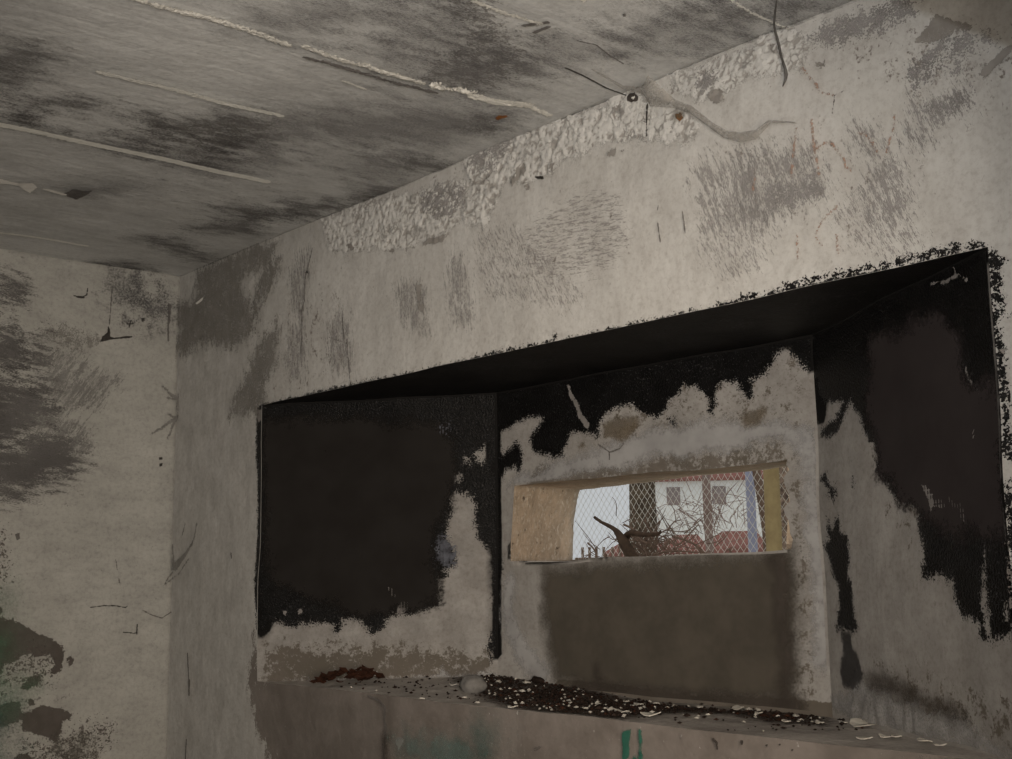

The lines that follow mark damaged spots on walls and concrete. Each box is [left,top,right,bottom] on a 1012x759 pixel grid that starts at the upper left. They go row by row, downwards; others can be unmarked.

peeling [318,0,922,337]
peeling [893,14,1012,160]
peeling [176,241,1012,689]